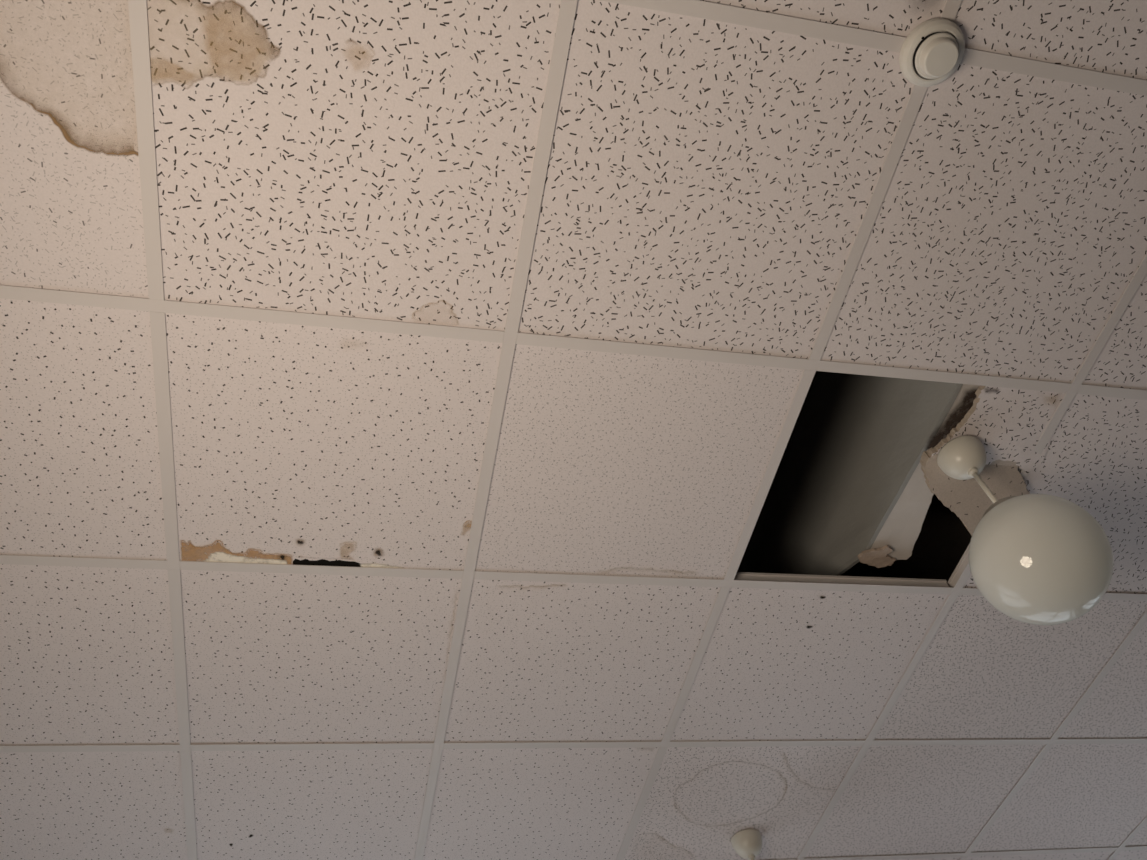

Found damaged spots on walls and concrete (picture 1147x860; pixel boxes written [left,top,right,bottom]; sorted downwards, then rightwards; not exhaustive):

leakage [13,93,138,156]
spalling [281,556,361,567]